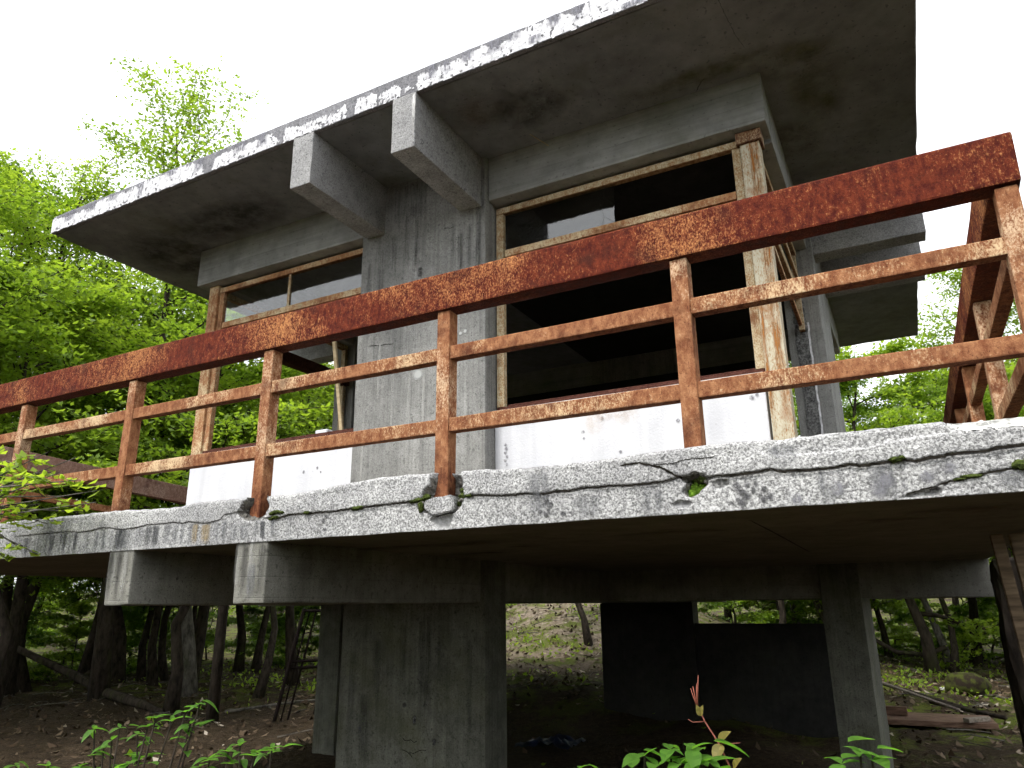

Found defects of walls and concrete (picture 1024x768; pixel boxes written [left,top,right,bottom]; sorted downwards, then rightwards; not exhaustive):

peeling [50,0,647,234]
corrosion [749,141,761,190]
corrosion [760,303,784,371]
crack [18,513,231,537]
spalling [238,495,270,521]
crack [267,500,414,519]
spalling [420,474,464,528]
spalling [673,473,729,508]
crack [464,443,1024,497]